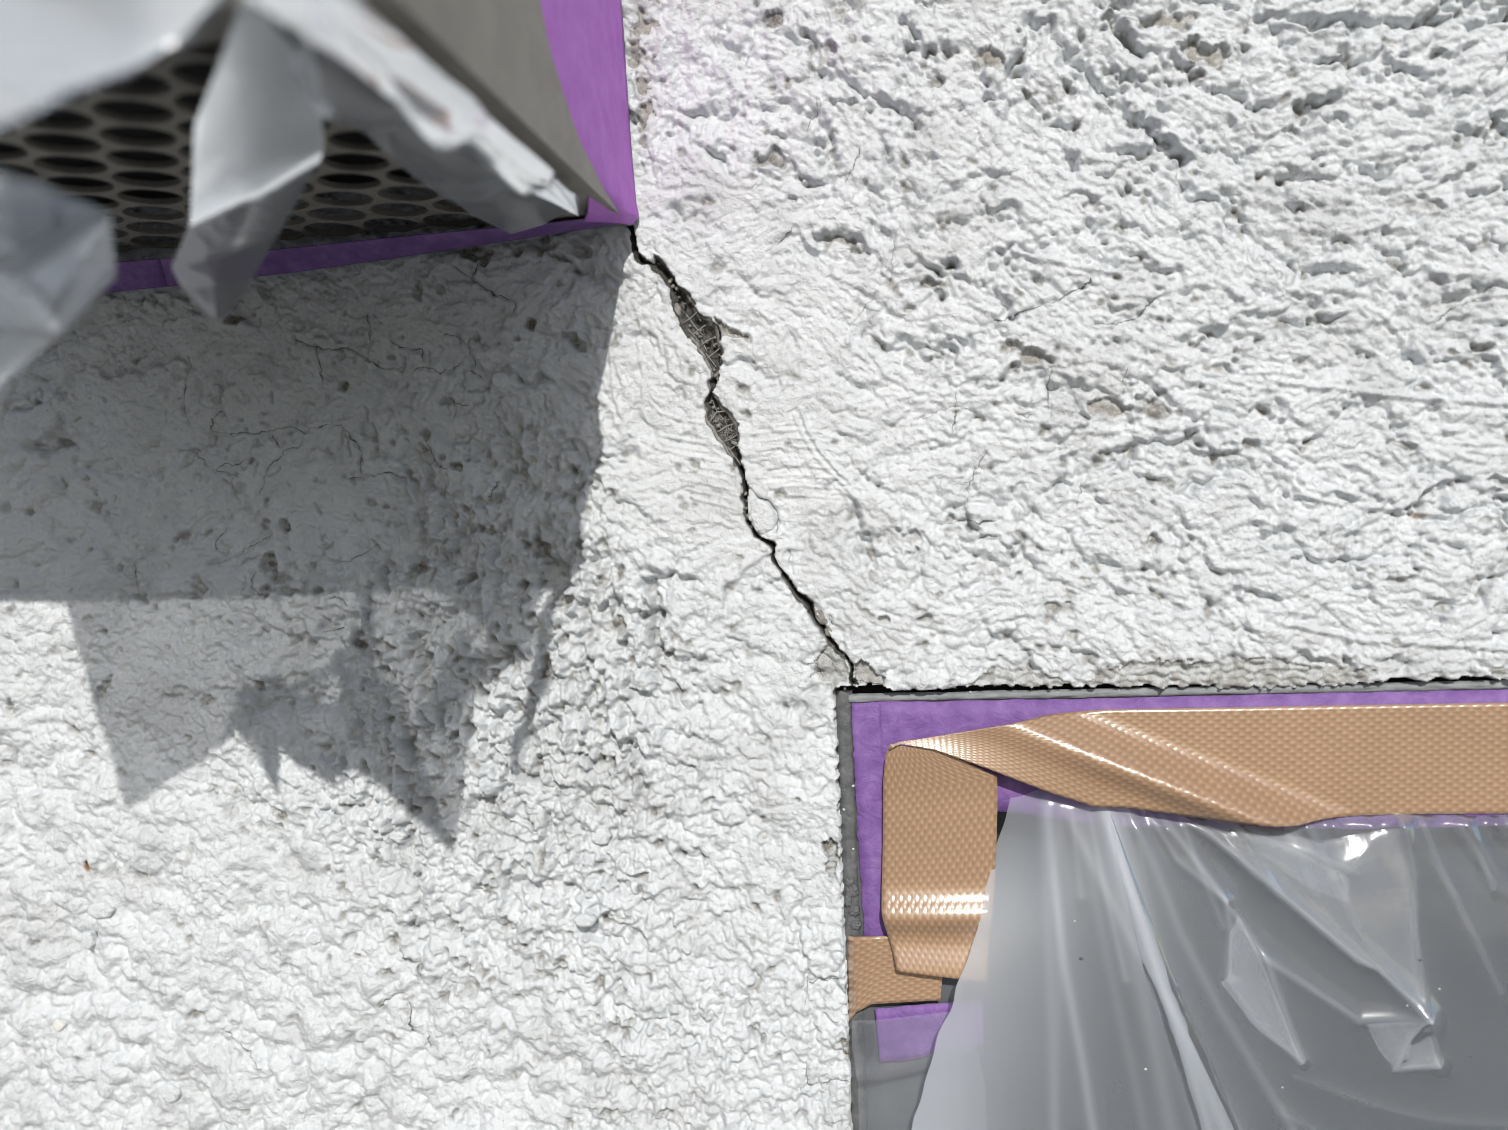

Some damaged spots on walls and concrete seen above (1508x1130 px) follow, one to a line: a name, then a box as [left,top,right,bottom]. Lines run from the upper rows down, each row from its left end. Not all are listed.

crack [627,224,881,686]